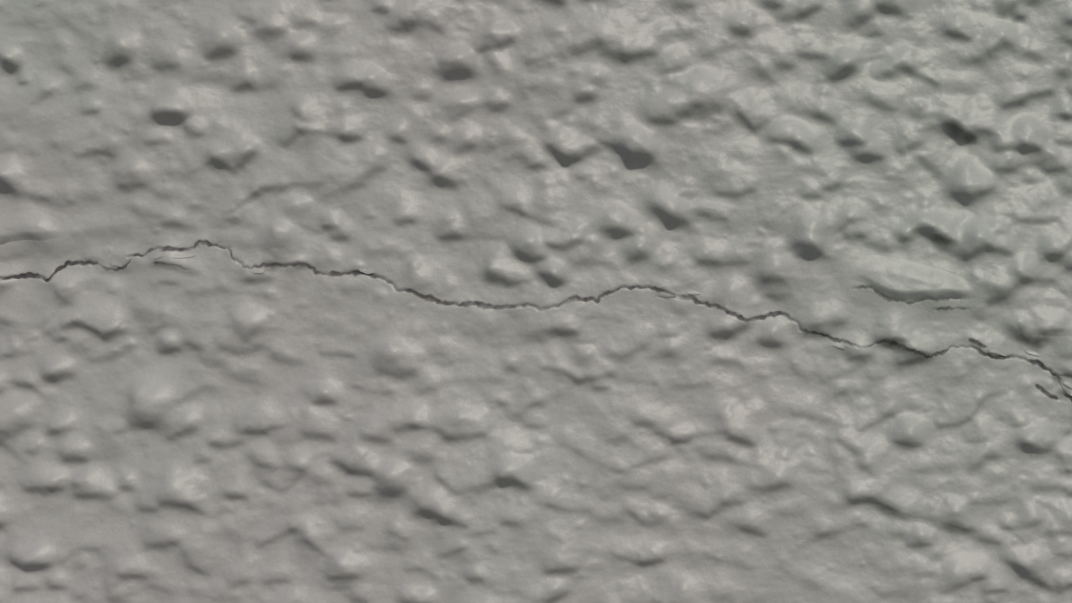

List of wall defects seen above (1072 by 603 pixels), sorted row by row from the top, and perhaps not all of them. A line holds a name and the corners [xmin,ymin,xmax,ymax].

crack [1,241,281,282]
crack [308,266,513,309]
crack [577,286,785,322]
crack [812,332,850,349]
crack [970,339,1072,402]